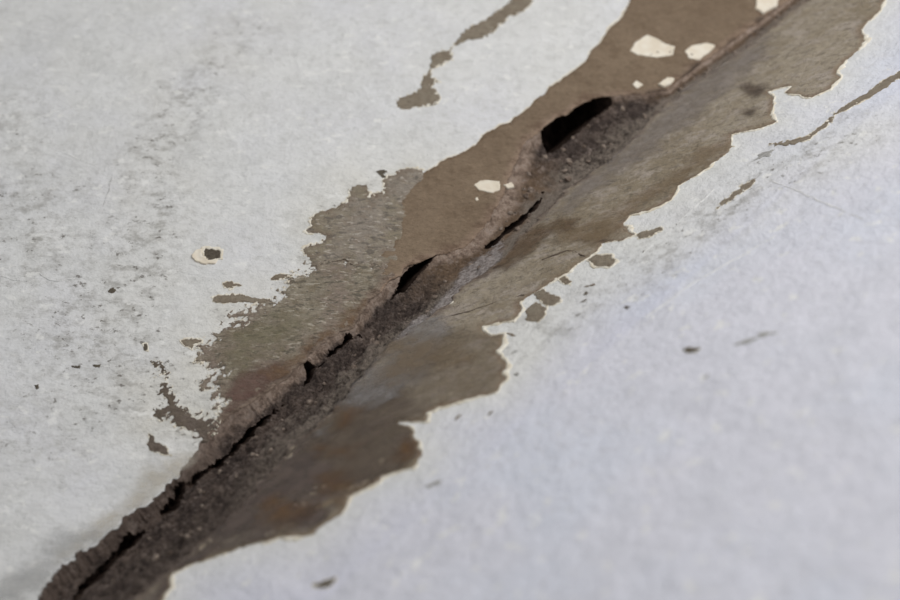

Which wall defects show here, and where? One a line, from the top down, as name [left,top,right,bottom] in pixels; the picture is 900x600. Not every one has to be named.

damp [741,84,763,95]
peeling [754,71,900,160]
peeling [150,0,803,443]
peeling [146,433,173,456]
crack [38,191,544,600]
damp [150,219,574,600]
peeling [311,577,337,589]